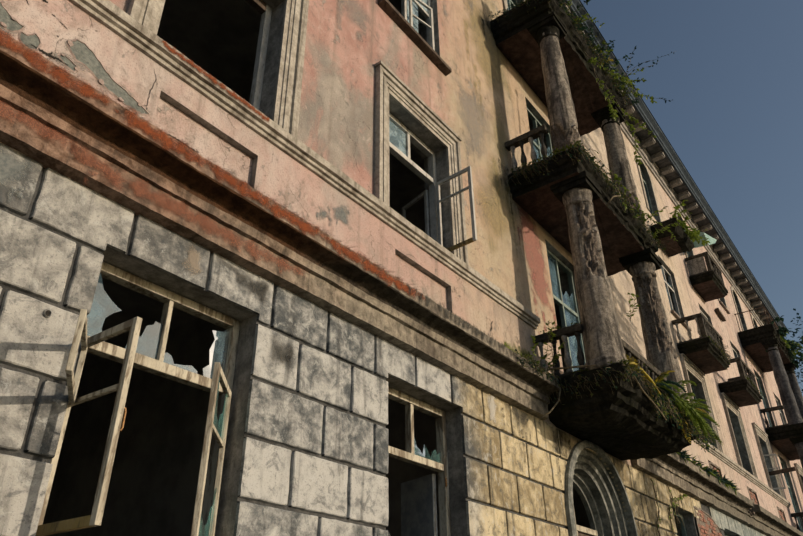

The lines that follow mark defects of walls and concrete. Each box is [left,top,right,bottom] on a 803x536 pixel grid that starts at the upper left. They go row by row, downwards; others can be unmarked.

spalling [0,0,42,51]
rust [0,31,111,105]
spalling [54,36,149,116]
rust [162,40,270,122]
rust [0,102,121,185]
rust [116,107,424,299]
flaking render [694,506,723,536]